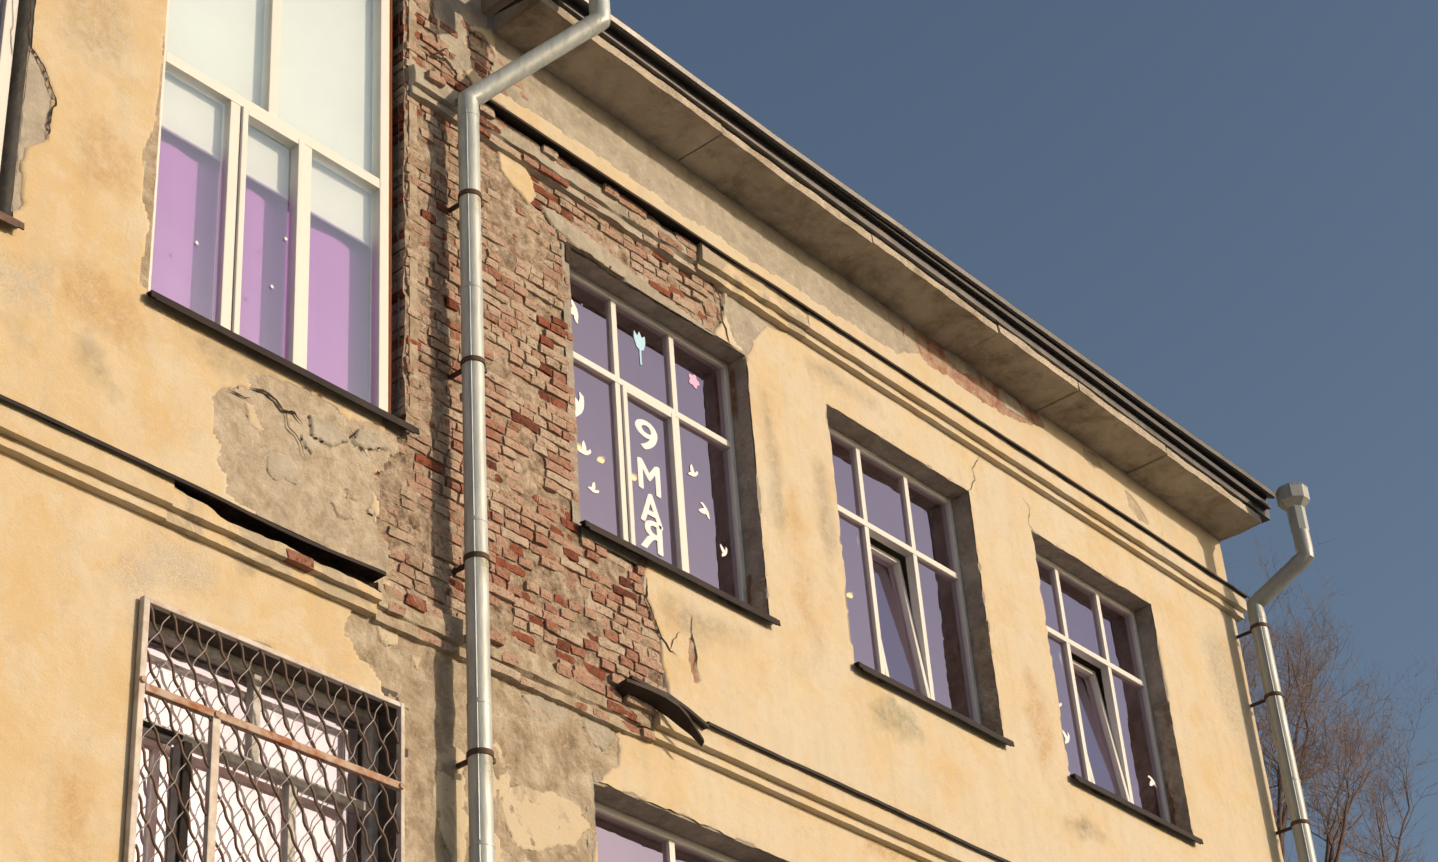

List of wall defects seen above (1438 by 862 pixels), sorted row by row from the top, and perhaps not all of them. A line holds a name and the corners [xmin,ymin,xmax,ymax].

spalling [11,46,52,216]
spalling [501,68,1043,428]
crack [230,388,306,457]
flaking render [160,0,524,862]
flaking render [480,140,783,692]
spalling [491,675,623,862]
crack [646,586,698,671]
spalling [972,621,1004,737]